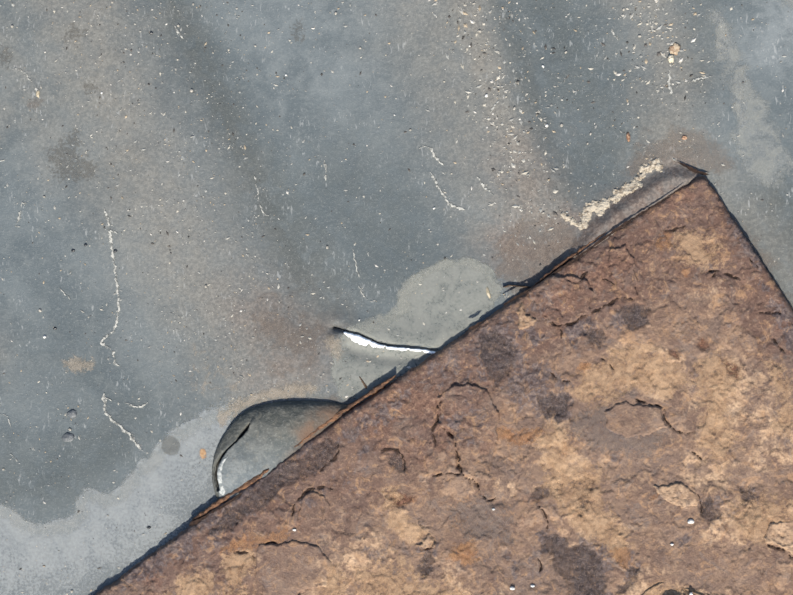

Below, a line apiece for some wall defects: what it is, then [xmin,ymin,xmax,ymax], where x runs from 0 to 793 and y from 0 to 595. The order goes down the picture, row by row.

water stain [560,158,663,230]
crack [100,209,120,366]
water stain [331,257,502,400]
rust [516,275,594,330]
crack [101,393,148,451]
rust [437,383,500,480]
rust [604,401,667,438]
water stain [0,406,234,595]
rust [653,483,699,508]
rust [763,520,793,555]
rust [255,540,332,595]